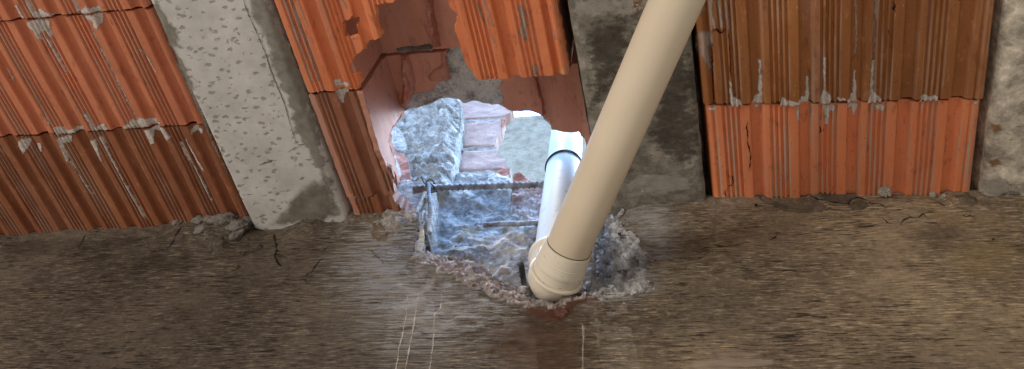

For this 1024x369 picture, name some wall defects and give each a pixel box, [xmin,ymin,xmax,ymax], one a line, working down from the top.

peeling [392,128,408,153]
spalling [510,172,543,219]
crack [812,196,976,226]
crack [242,224,296,266]
spalling [348,192,655,310]